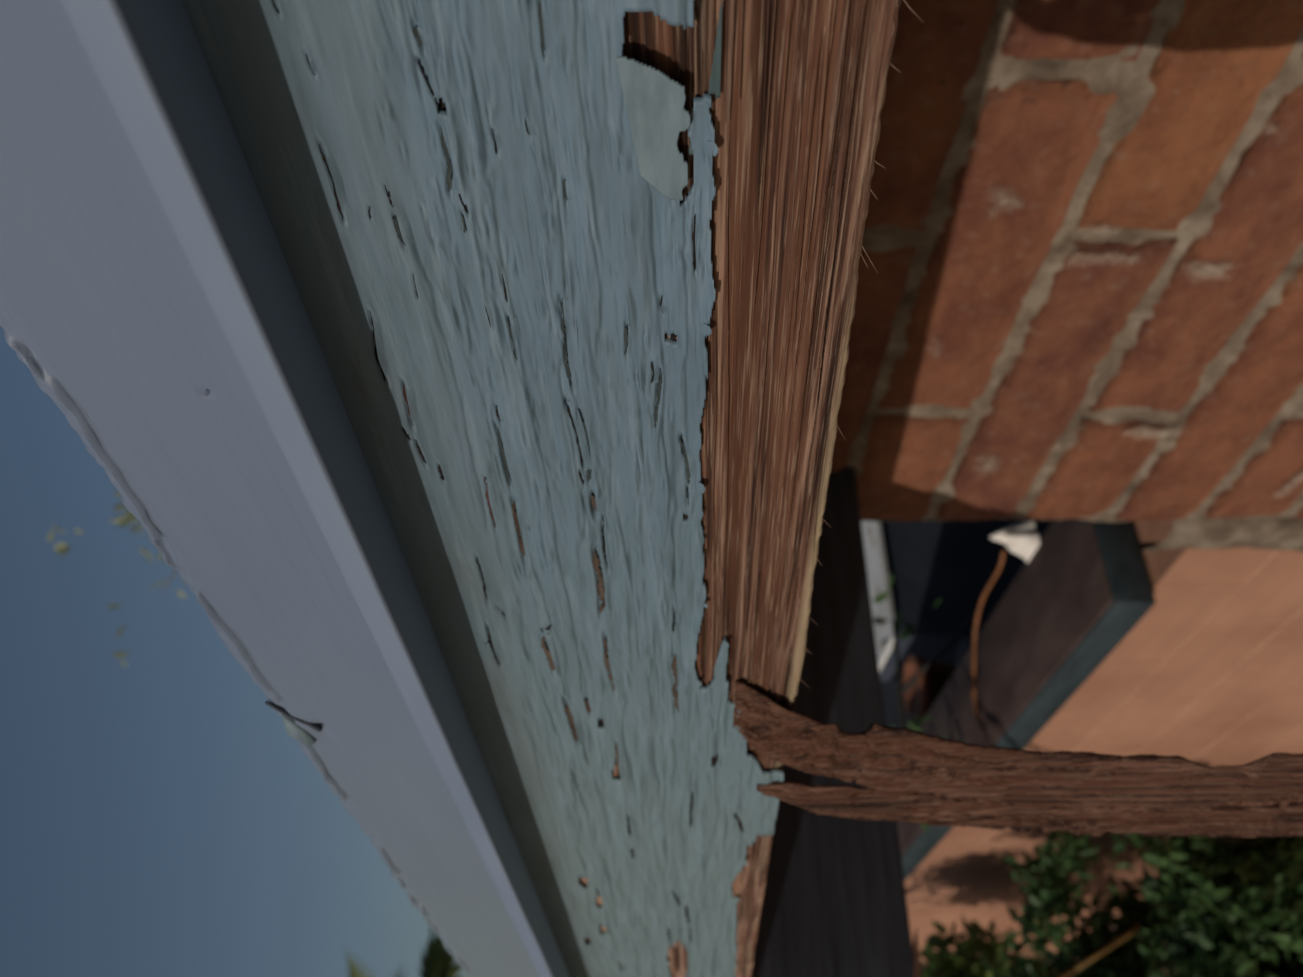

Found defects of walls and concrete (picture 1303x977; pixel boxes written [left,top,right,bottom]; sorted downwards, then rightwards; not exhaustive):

crack [538,0,554,58]
crack [413,27,469,233]
crack [319,144,420,298]
crack [692,208,703,272]
crack [370,313,444,480]
crack [484,407,535,557]
crack [541,299,625,769]
crack [624,326,696,506]
peeling [617,0,924,711]
crack [265,701,323,747]
crack [671,608,679,712]
peeling [731,835,773,977]